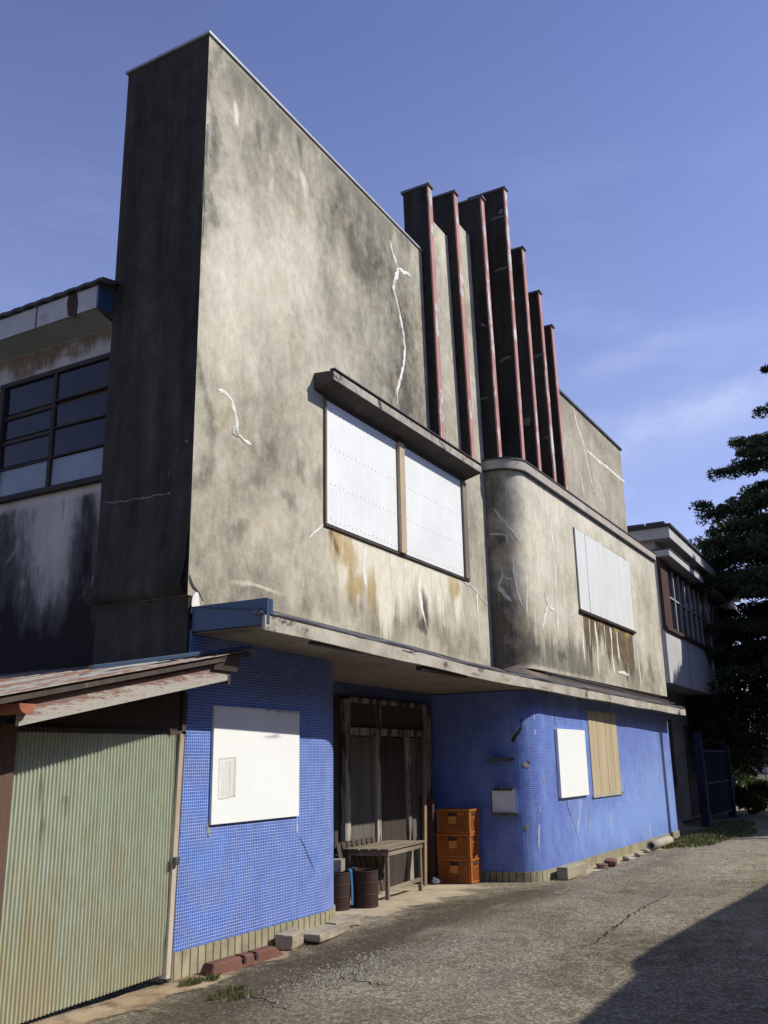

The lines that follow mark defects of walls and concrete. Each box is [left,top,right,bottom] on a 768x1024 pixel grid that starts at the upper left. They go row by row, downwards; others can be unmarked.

crack [389,239,411,409]
crack [218,389,252,445]
crack [543,406,626,494]
crack [464,509,574,631]